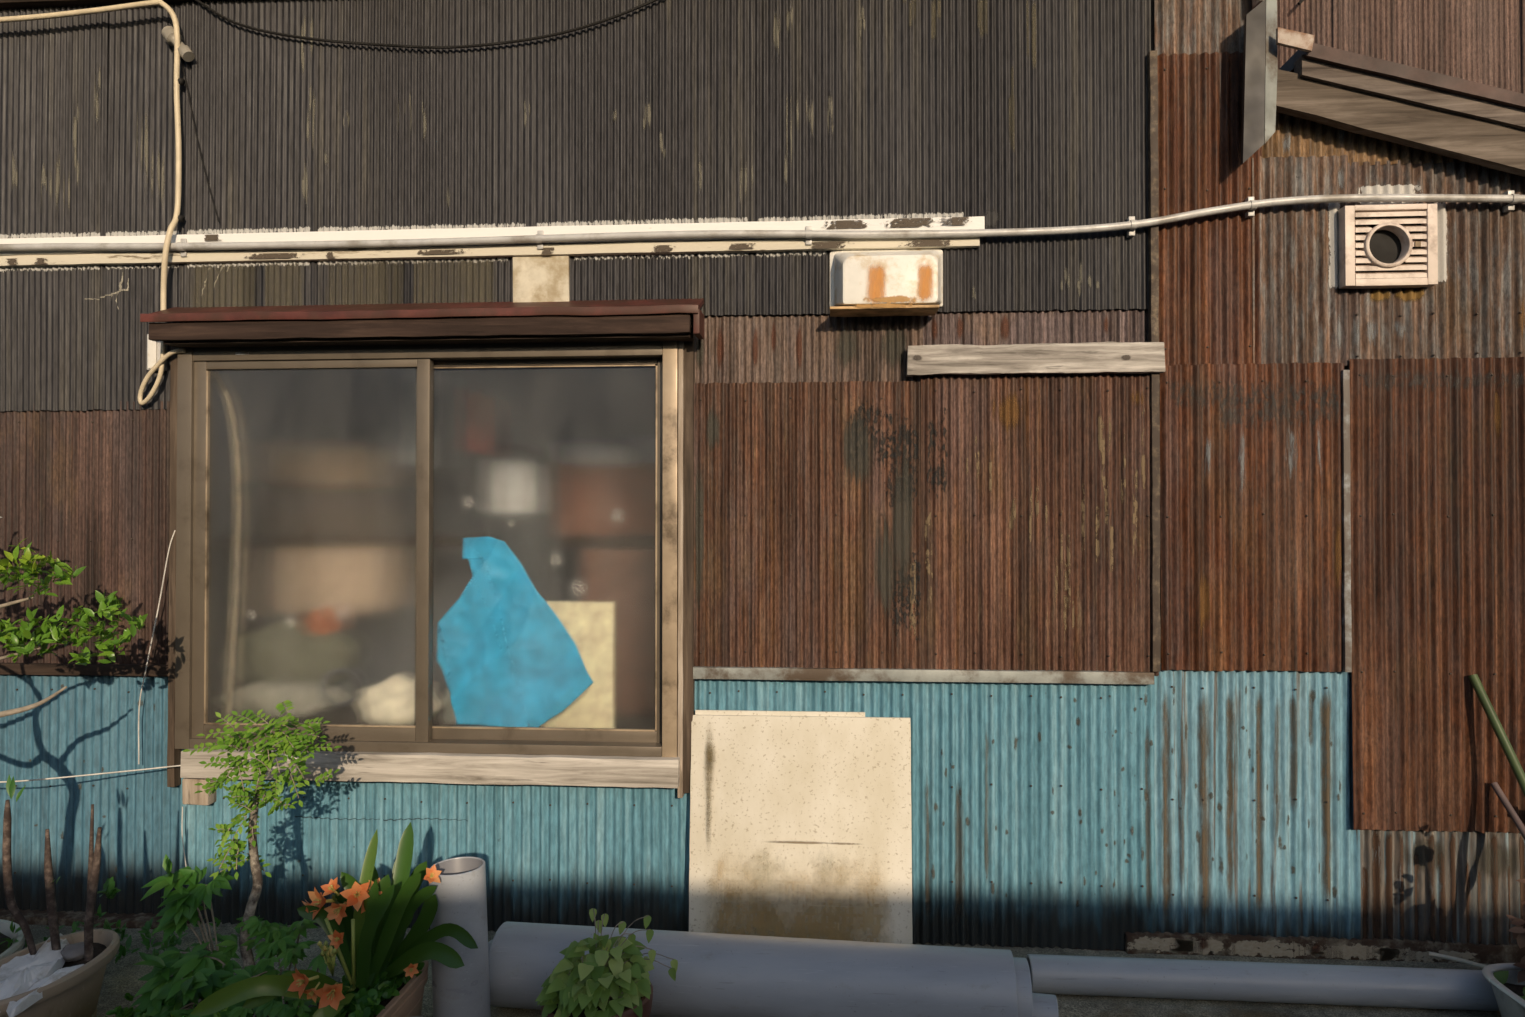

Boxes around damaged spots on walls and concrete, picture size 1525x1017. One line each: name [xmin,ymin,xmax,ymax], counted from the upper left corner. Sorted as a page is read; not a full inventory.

corrosion [856,266,932,308]
corrosion [753,324,776,363]
damp [844,394,948,640]
corrosion [1200,578,1210,633]
spalling [1126,936,1480,964]